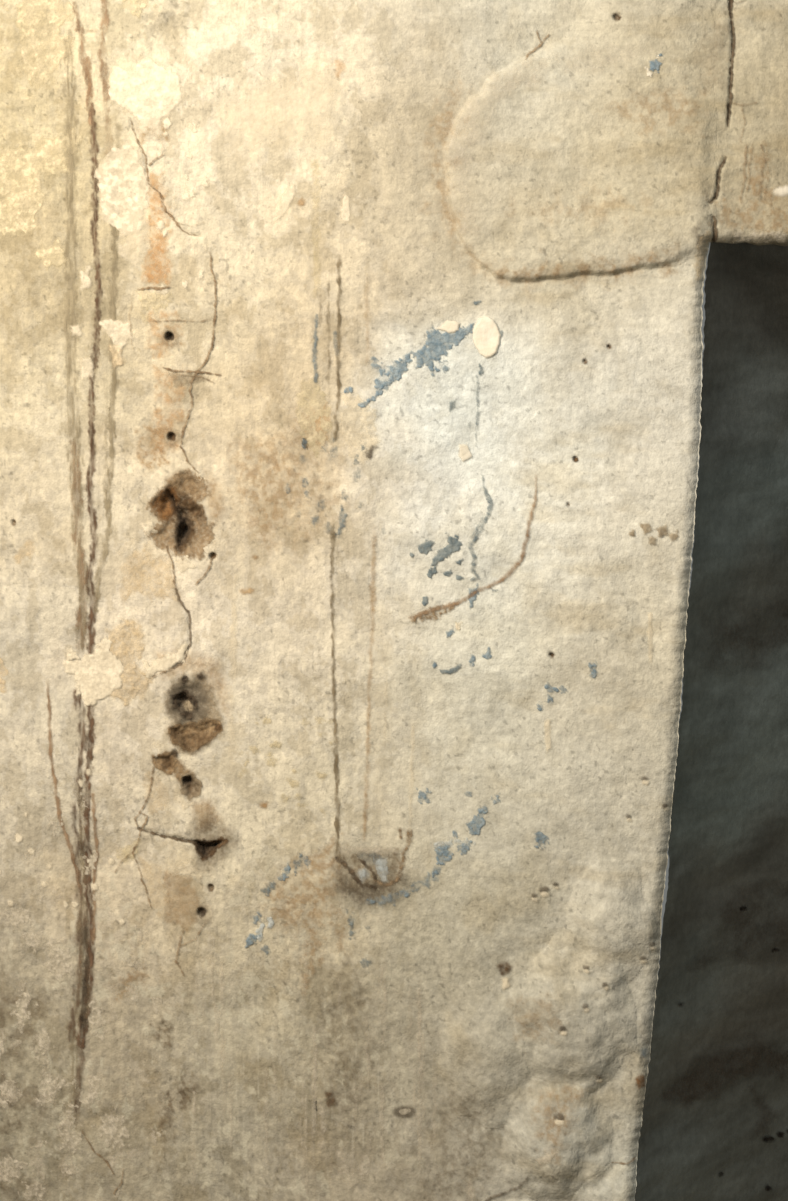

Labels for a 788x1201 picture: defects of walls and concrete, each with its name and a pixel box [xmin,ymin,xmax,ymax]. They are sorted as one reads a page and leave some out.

crack [710,0,762,242]
crack [131,121,220,469]
crack [153,546,214,677]
crack [115,766,199,906]
peeling [359,852,387,881]